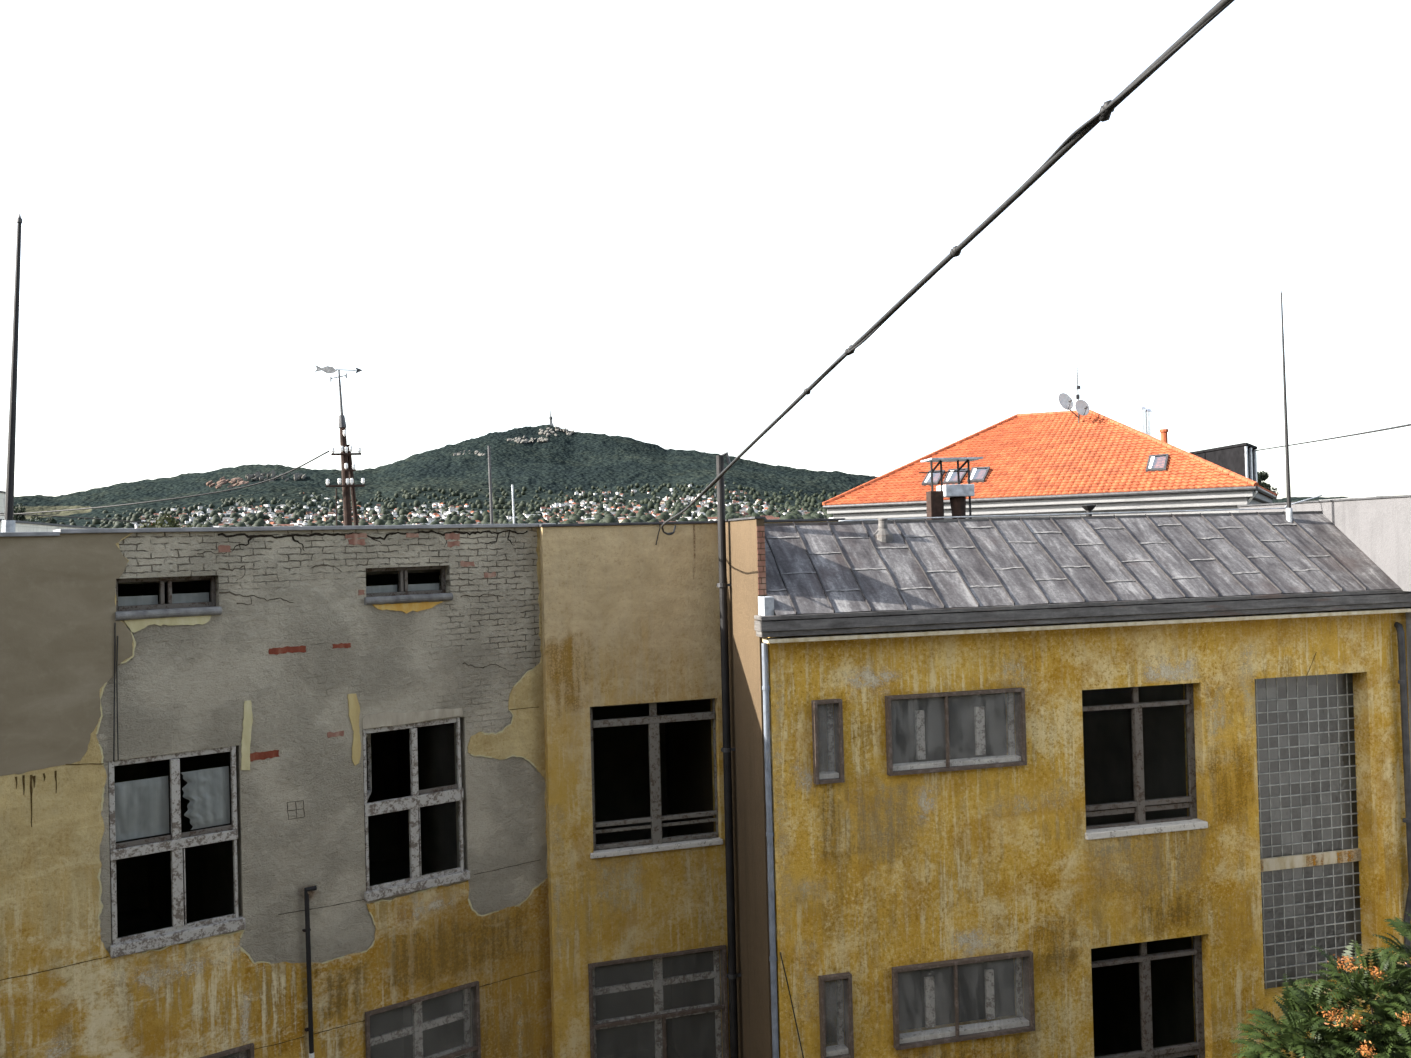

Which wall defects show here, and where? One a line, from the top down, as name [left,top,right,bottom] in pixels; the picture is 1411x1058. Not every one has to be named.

damp [15,771,57,827]
flaking render [96,527,548,965]